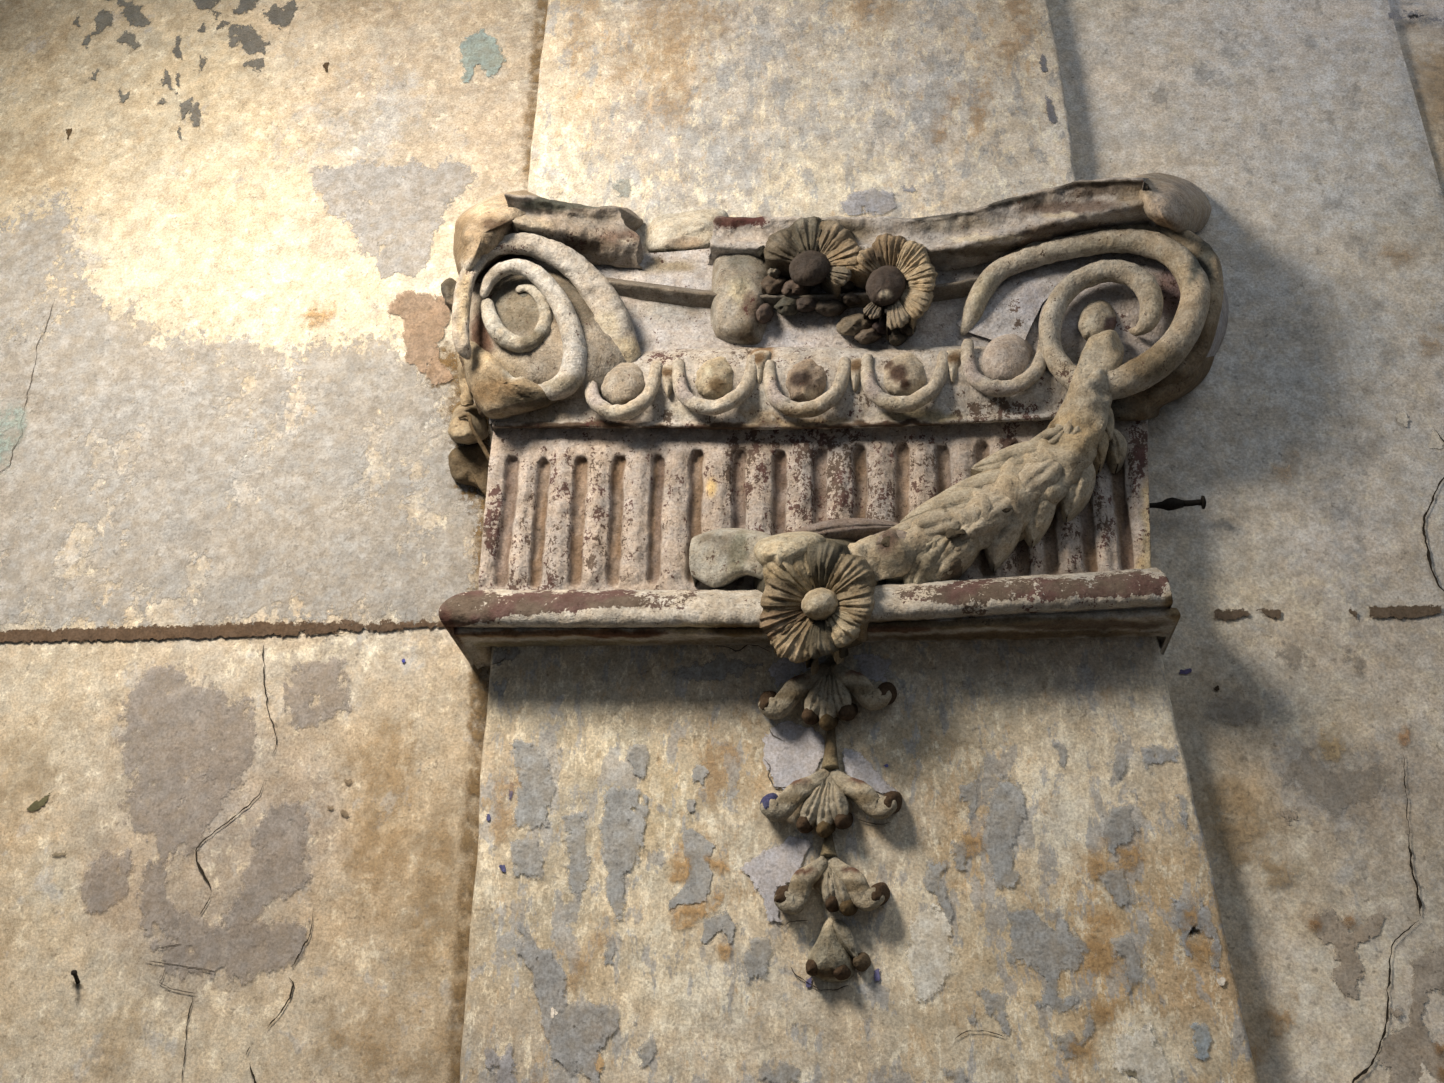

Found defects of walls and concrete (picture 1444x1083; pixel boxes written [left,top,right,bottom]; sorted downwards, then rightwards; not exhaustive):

peeling [157,36,201,140]
peeling [193,0,297,72]
damp [432,341,475,414]
damp [454,484,486,589]
crack [1422,477,1444,591]
crack [195,645,277,916]
peeling [762,721,896,794]
peeling [509,739,649,965]
peeling [668,764,811,983]
crack [1352,752,1422,1083]
crack [182,998,193,1075]
crack [246,914,313,1083]